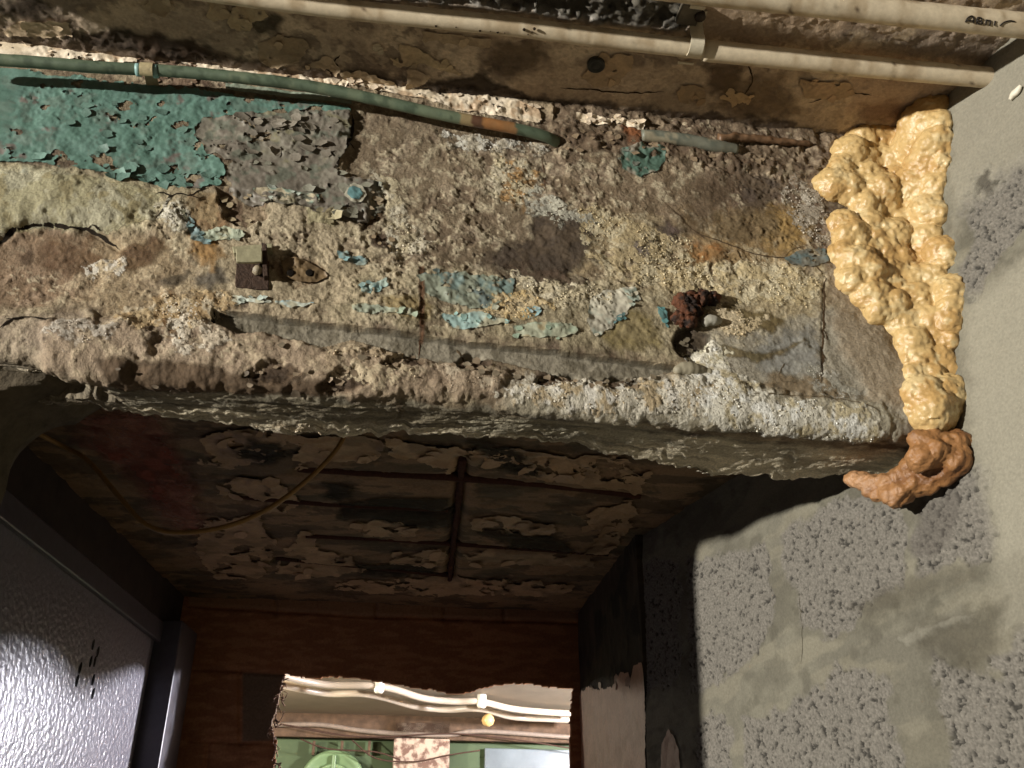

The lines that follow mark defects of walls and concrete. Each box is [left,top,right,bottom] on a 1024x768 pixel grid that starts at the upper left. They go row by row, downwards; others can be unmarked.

peeling [0,21,542,251]
crack [0,222,118,249]
peeling [352,277,418,317]
spalling [97,295,722,397]
peeling [417,268,641,340]
peeling [194,428,653,597]
peeling [579,662,646,768]